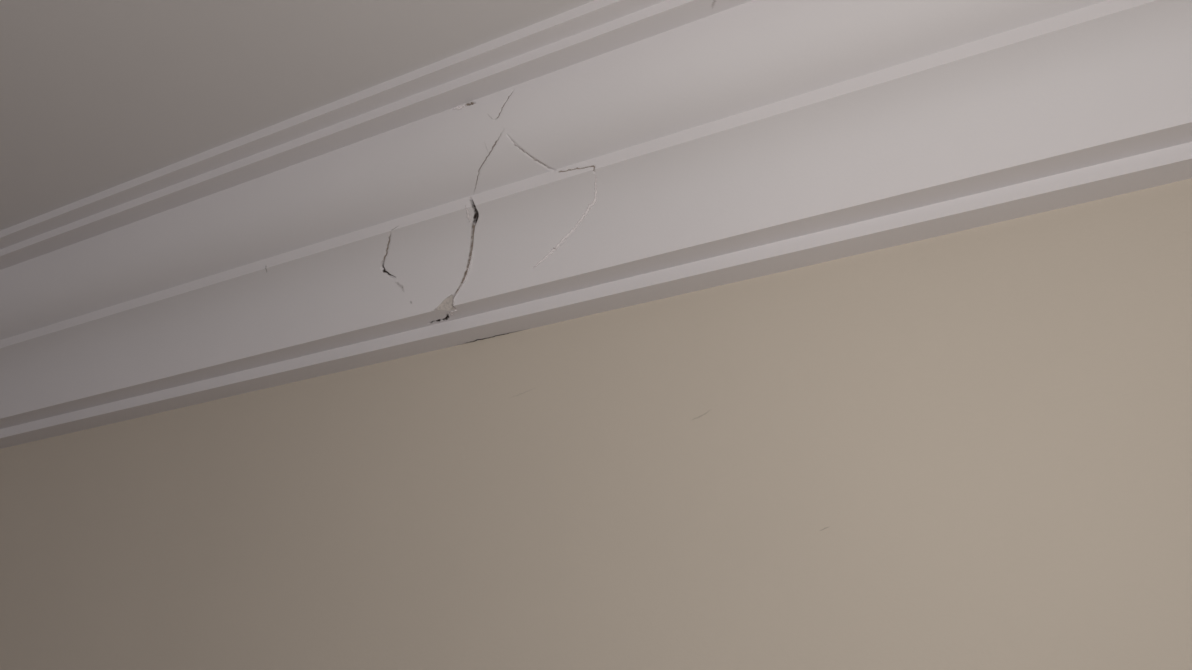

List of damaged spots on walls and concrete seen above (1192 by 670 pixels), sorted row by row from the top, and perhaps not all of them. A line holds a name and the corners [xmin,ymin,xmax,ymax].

crack [452,93,512,309]